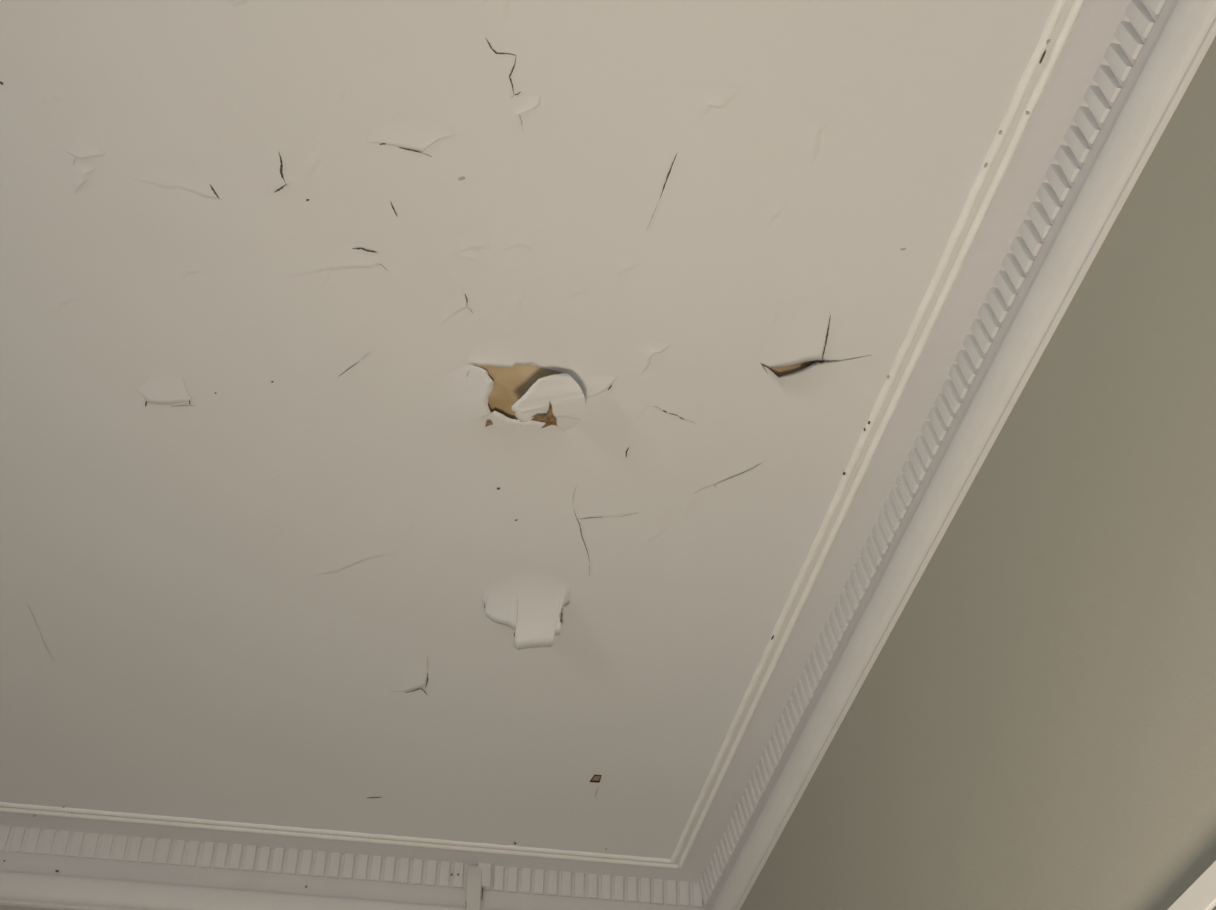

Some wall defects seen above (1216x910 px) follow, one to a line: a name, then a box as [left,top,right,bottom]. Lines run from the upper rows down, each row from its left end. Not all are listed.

crack [486,39,521,99]
crack [238,149,291,193]
crack [636,154,677,236]
crack [690,449,767,493]